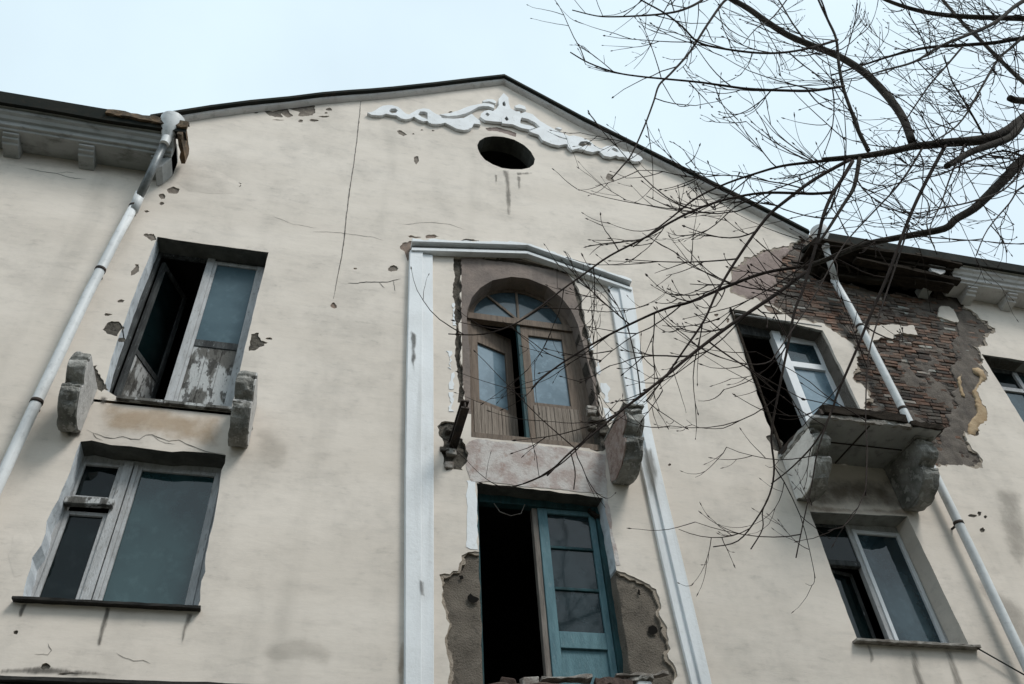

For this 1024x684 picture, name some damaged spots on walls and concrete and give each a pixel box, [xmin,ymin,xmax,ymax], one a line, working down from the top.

spalling [255,105,332,122]
crack [273,102,398,299]
spalling [103,314,126,342]
crack [90,431,220,454]
spalling [249,333,272,351]
spalling [438,351,483,684]
spalling [603,495,677,684]
flaking render [714,235,1022,469]